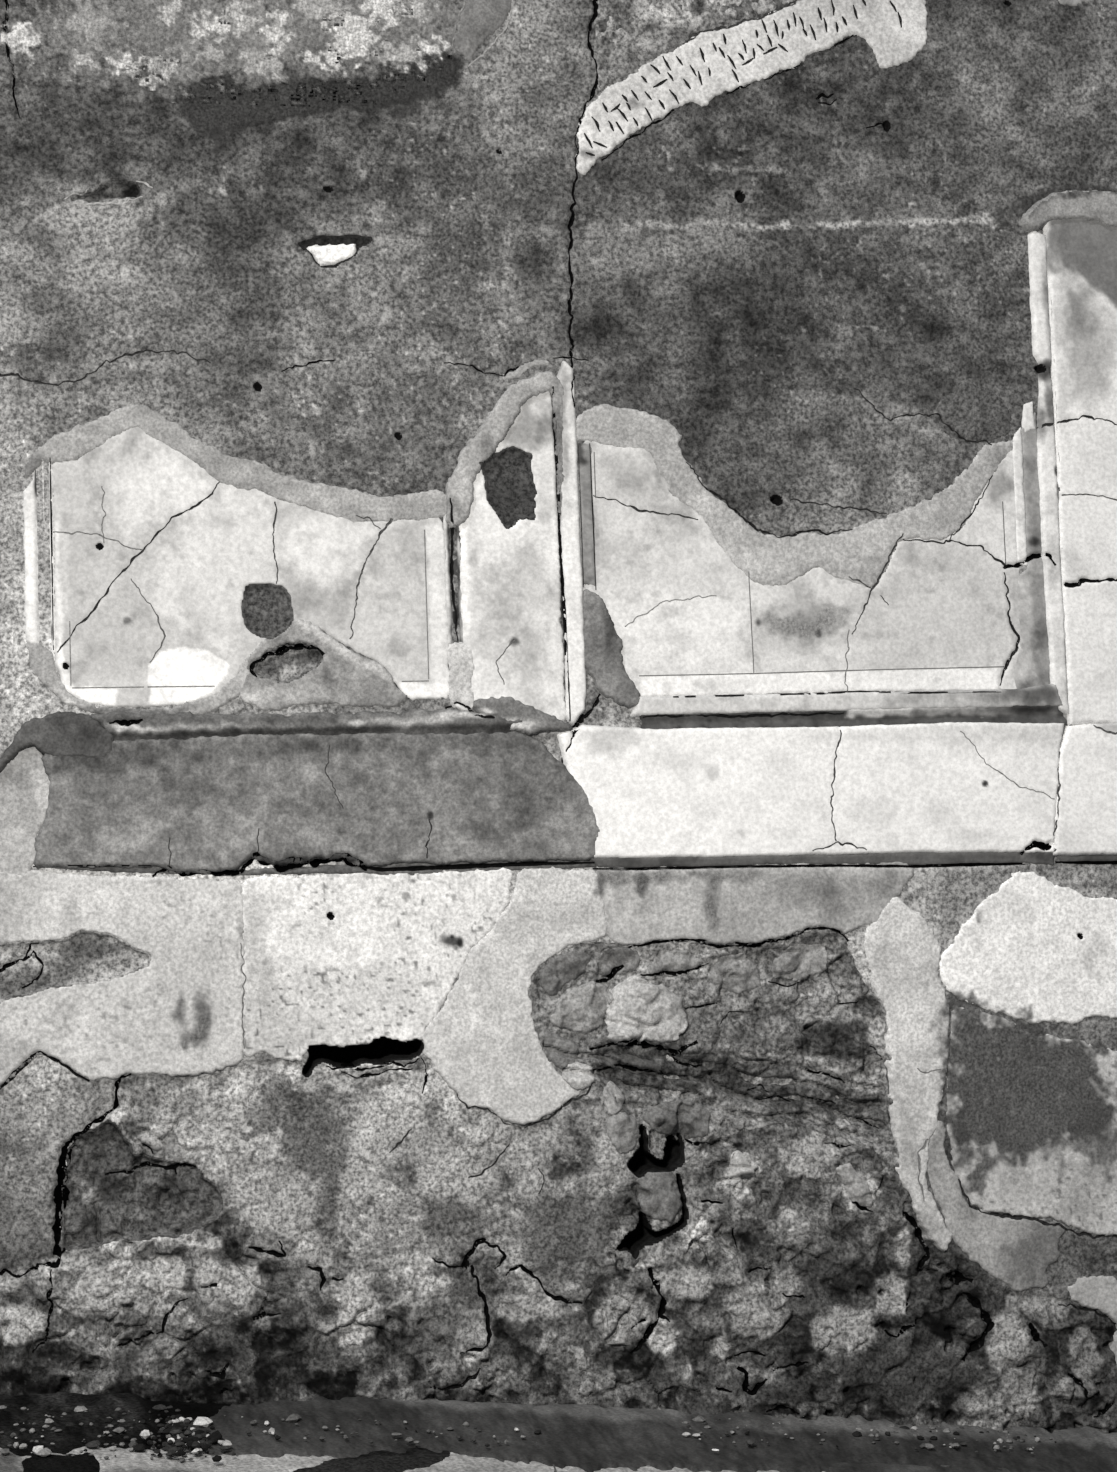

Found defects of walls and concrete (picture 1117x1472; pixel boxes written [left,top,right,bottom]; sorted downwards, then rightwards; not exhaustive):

damp [0,0,461,147]
peeling [306,244,356,266]
crack [554,0,674,408]
crack [53,482,220,662]
crack [249,515,393,677]
spalling [479,446,537,529]
crack [593,388,1117,692]
crack [960,724,1117,855]
spalling [0,930,151,1004]
spalling [528,929,900,1223]
damp [941,992,1117,1195]
spalling [60,1120,223,1251]